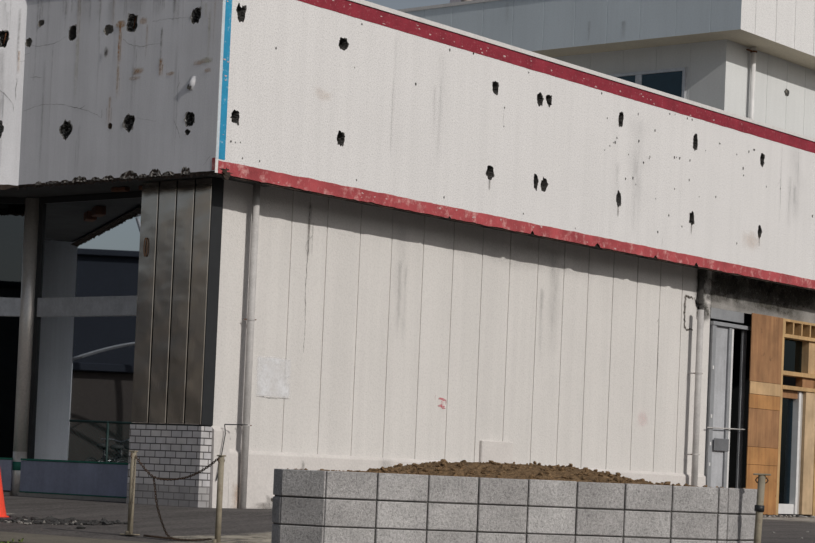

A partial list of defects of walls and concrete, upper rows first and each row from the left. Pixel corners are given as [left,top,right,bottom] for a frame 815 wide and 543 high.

hole [126,13,138,32]
hole [190,6,202,24]
spalling [227,0,247,22]
hole [0,30,9,48]
hole [537,92,552,108]
hole [59,119,73,140]
hole [122,113,135,133]
hole [184,112,195,135]
spalling [0,167,815,290]